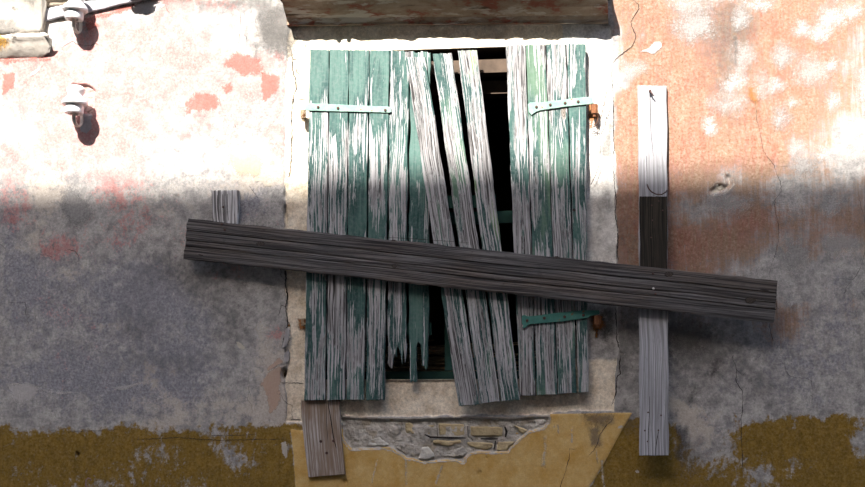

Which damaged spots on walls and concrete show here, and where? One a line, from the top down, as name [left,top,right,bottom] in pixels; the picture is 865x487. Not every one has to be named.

peeling [129,1,164,24]
peeling [45,19,59,38]
flaking render [641,42,662,54]
peeling [2,72,14,94]
peeling [261,72,279,101]
spalling [71,82,97,134]
crack [287,38,307,177]
peeling [261,328,291,413]
spalling [341,415,551,467]